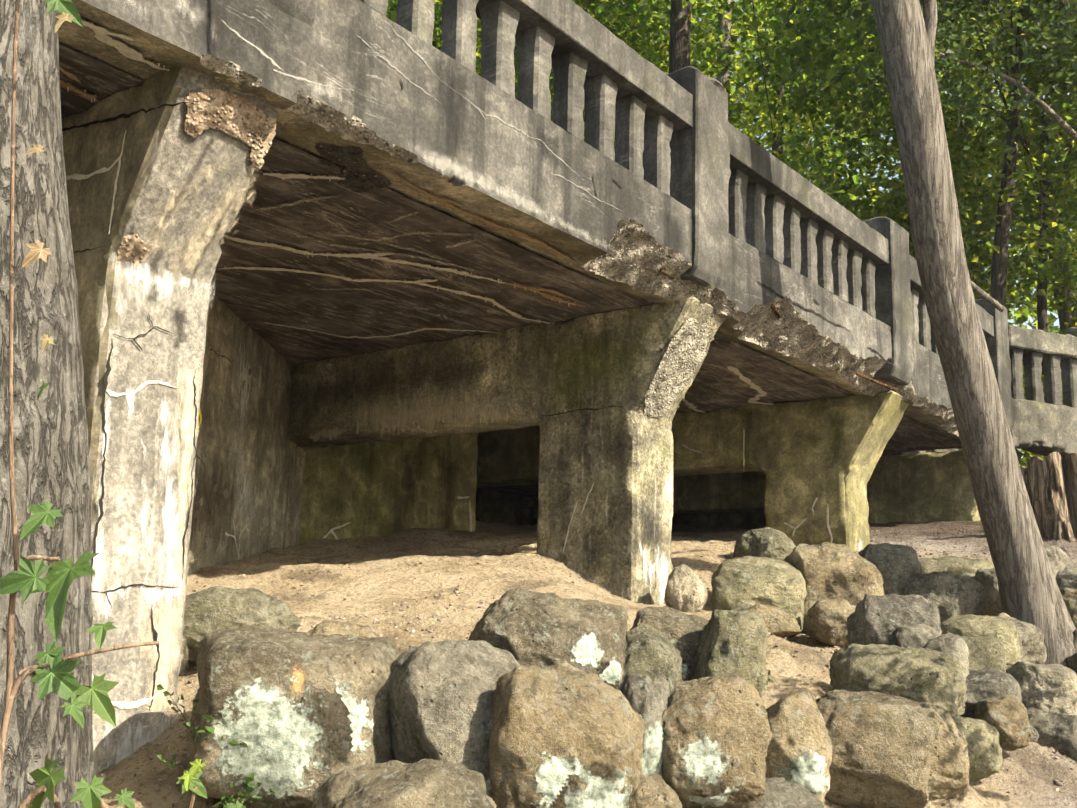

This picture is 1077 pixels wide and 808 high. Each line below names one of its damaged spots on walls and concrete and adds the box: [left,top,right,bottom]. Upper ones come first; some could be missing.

spalling [184,54,419,193]
spalling [116,233,150,265]
spalling [581,218,959,437]
crack [91,313,232,710]
leakage [563,483,594,552]
leakage [640,517,668,605]